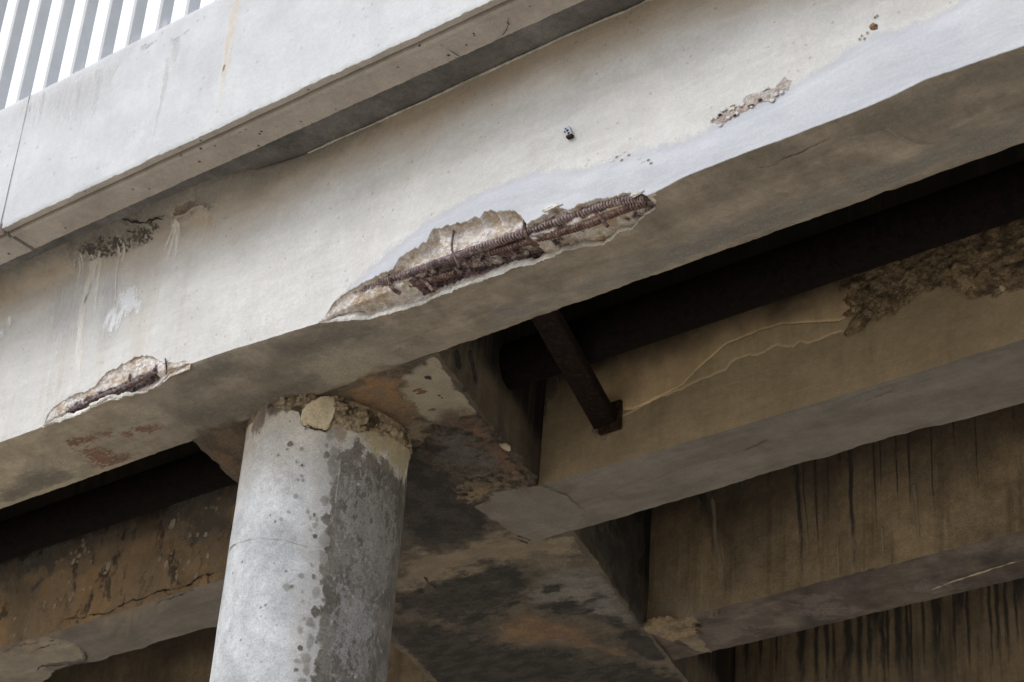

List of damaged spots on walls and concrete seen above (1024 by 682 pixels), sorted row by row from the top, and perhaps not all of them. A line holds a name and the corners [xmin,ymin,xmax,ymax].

peeling [710,77,791,127]
crack [122,215,165,233]
leakage [59,164,287,377]
spalling [318,190,658,323]
flaking render [590,218,1024,417]
spalling [42,355,191,428]
peeling [300,396,335,432]
leakage [402,441,499,546]
crack [56,573,216,627]
leakage [391,517,764,682]
leakage [793,582,970,682]
leakage [987,578,1024,649]